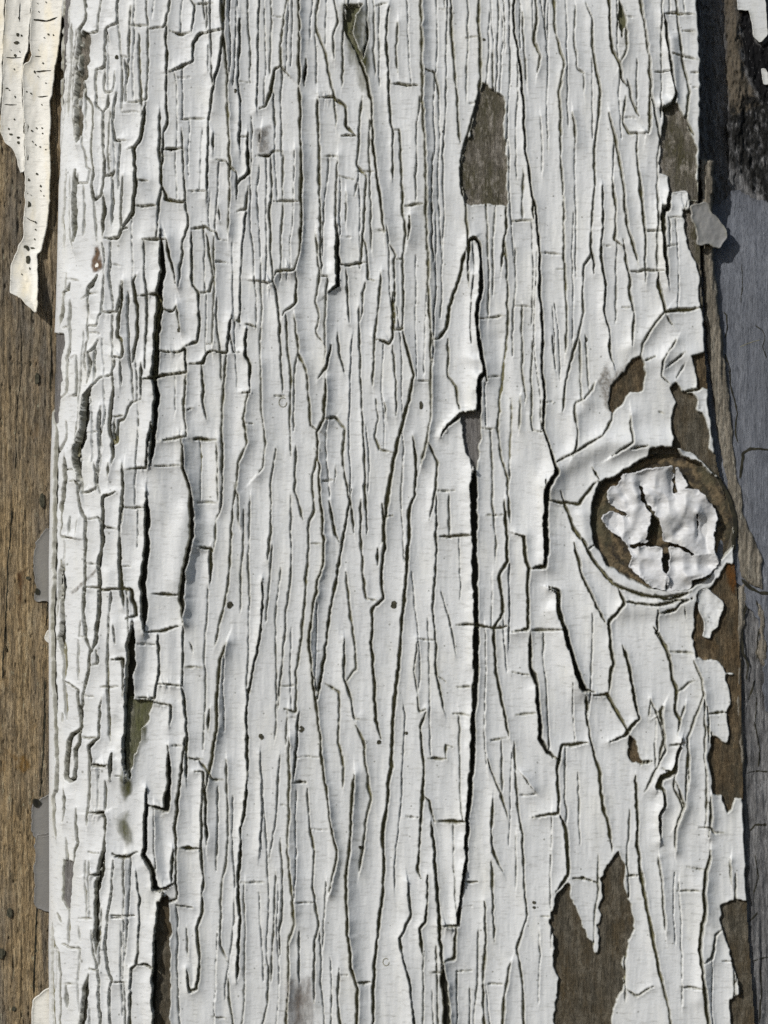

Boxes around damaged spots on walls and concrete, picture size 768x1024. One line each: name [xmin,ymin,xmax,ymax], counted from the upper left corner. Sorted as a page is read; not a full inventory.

peeling [0,0,71,313]
peeling [460,84,508,207]
peeling [651,14,727,311]
crack [33,0,306,1024]
crack [246,0,719,1024]
peeling [545,351,743,812]
crack [699,264,768,552]
peeling [550,852,634,1024]
peeling [720,898,755,1024]
crack [734,856,759,922]